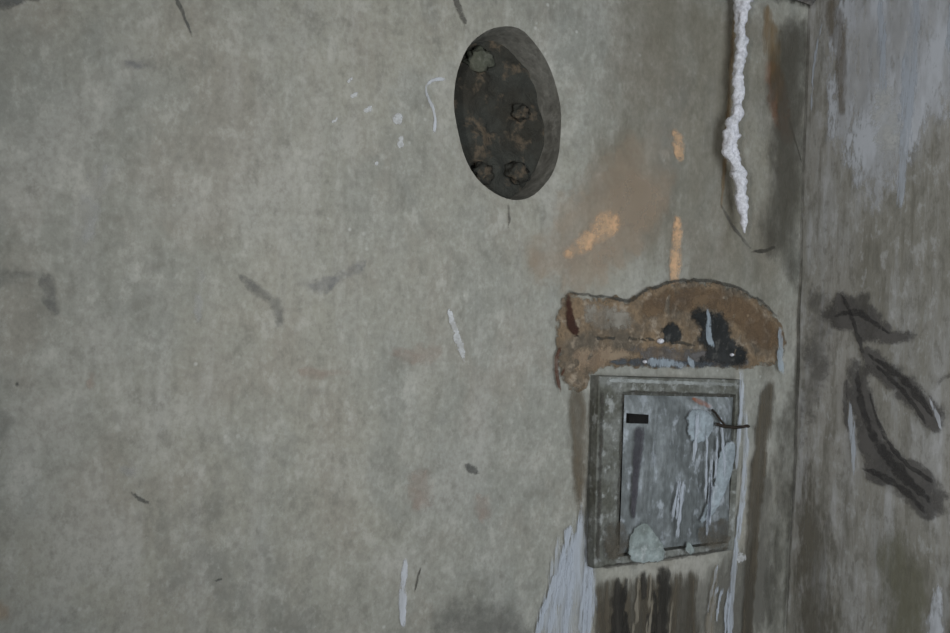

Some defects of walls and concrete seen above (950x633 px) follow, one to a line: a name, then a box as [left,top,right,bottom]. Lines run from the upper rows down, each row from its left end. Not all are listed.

crack [176,0,191,33]
crack [454,0,466,24]
water stain [768,0,950,251]
corrosion [670,217,682,279]
spalling [554,278,787,502]
water stain [782,344,800,451]
water stain [848,402,856,471]
water stain [536,383,796,633]